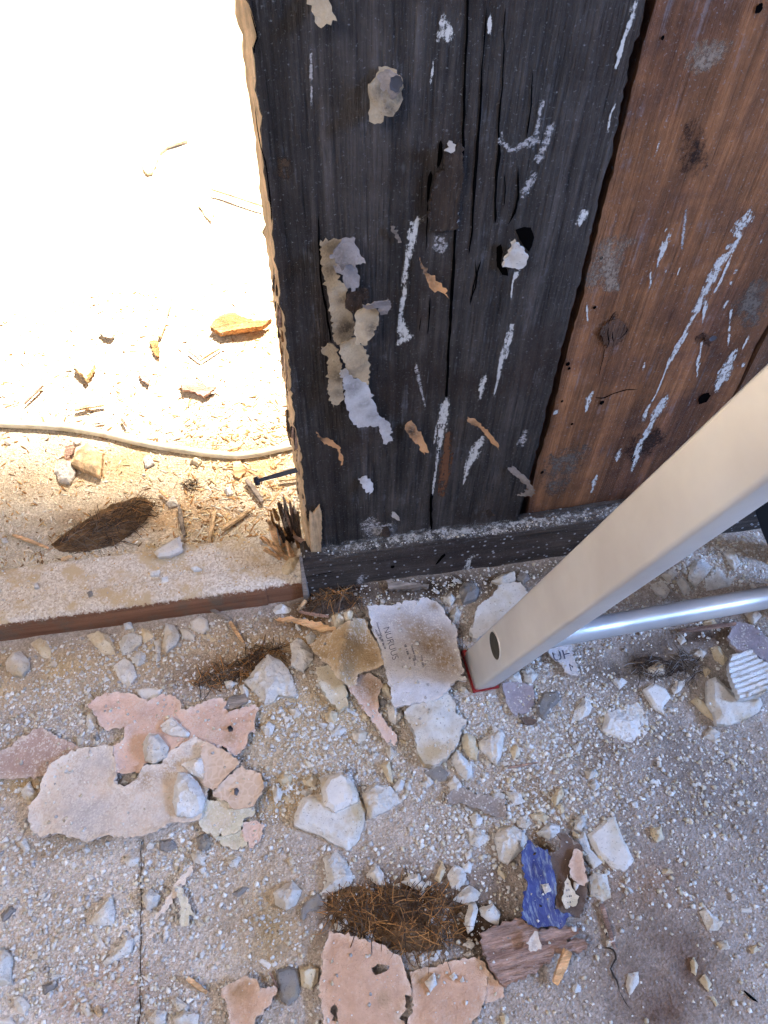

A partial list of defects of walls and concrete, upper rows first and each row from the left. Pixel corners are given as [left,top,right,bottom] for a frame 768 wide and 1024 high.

peeling [307,0,337,28]
peeling [368,66,404,124]
crack [525,73,533,138]
crack [419,0,520,531]